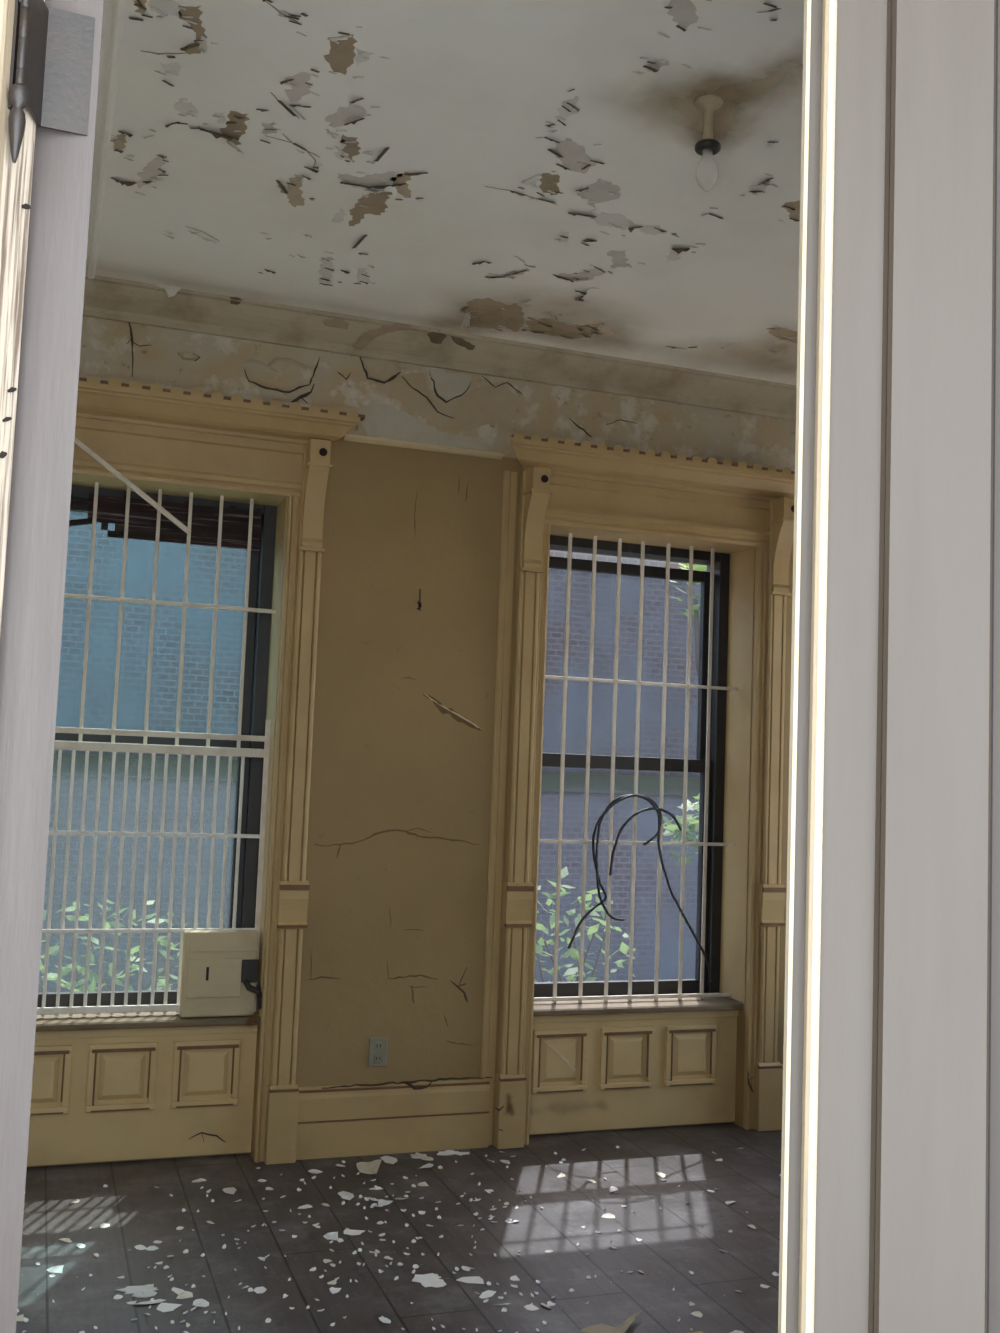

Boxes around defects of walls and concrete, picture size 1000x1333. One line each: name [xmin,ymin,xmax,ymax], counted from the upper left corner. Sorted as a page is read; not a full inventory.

leakage [672,63,793,137]
peeling [110,0,428,286]
peeling [485,89,706,303]
peeling [778,200,800,222]
peeling [472,256,536,279]
crack [127,322,151,377]
peeling [427,298,602,350]
peeling [769,325,798,353]
crack [291,357,455,419]
crack [482,376,523,395]
crack [569,418,637,438]
crack [314,828,479,858]